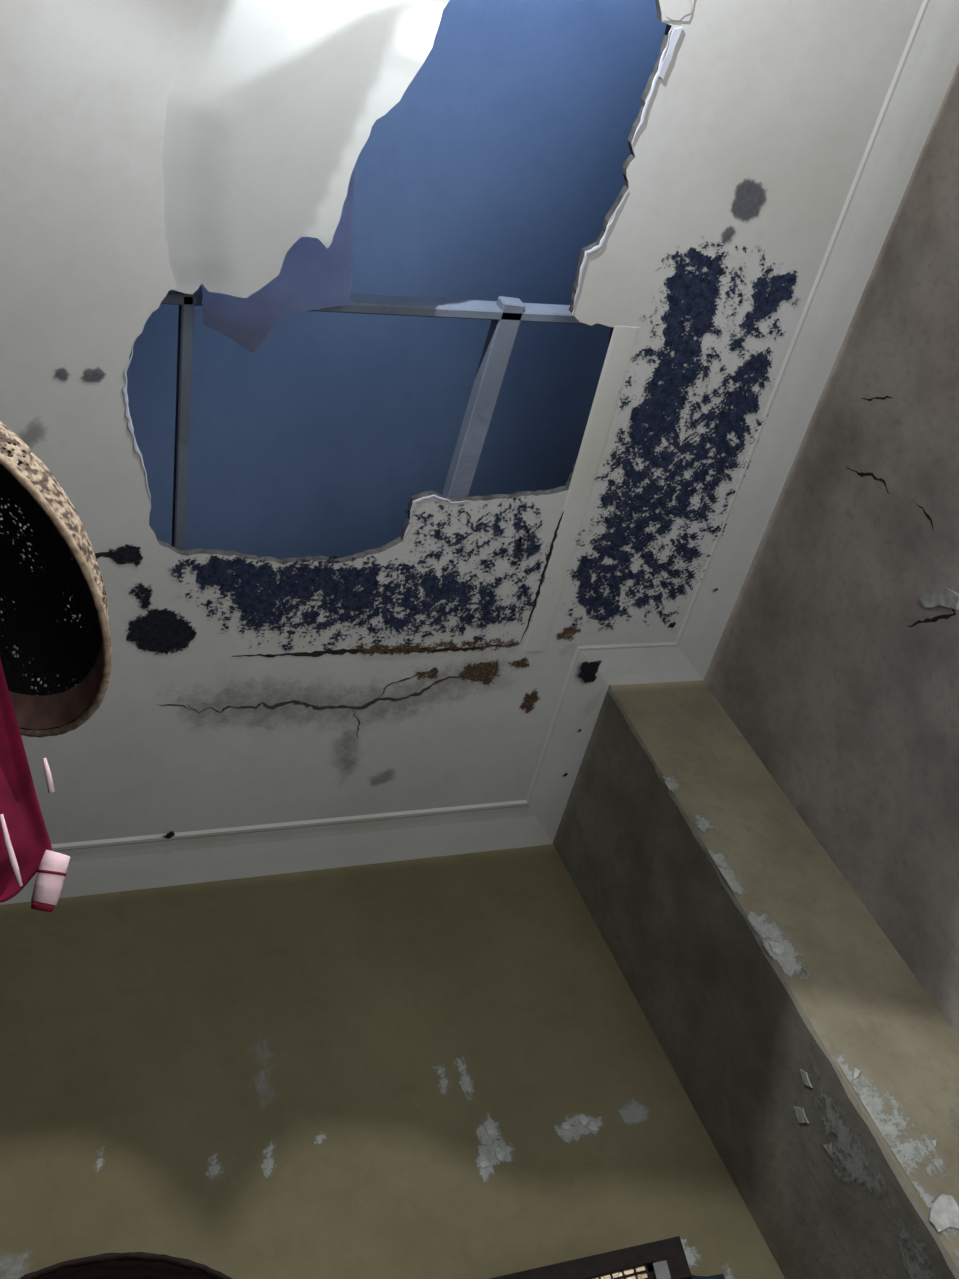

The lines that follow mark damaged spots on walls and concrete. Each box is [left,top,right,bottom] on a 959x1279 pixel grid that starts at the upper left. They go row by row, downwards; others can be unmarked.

peeling [659,0,694,79]
leakage [568,179,798,629]
crack [861,394,891,402]
crack [846,467,933,529]
leakage [170,497,549,656]
leakage [126,583,197,655]
crack [157,511,564,738]
flaking render [707,849,746,895]
flaking render [748,911,810,981]
peeling [475,1114,514,1182]
peeling [555,1113,604,1144]
peeling [794,1053,959,1279]